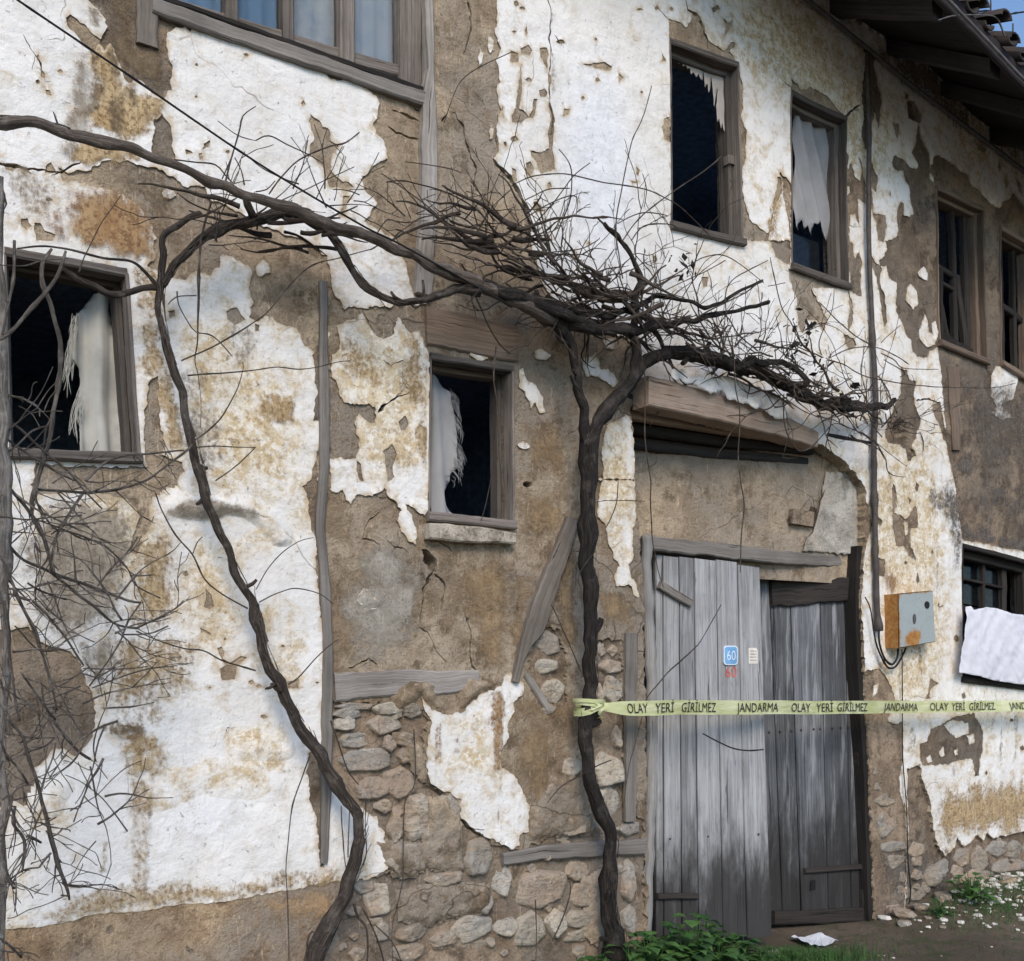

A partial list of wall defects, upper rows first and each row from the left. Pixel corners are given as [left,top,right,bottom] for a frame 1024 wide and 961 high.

peeling [662,117,670,142]
peeling [743,49,1024,564]
damp [19,499,338,923]
peeling [0,0,649,961]
crack [422,573,445,601]
flaking render [864,669,1024,920]
damp [880,779,1024,898]